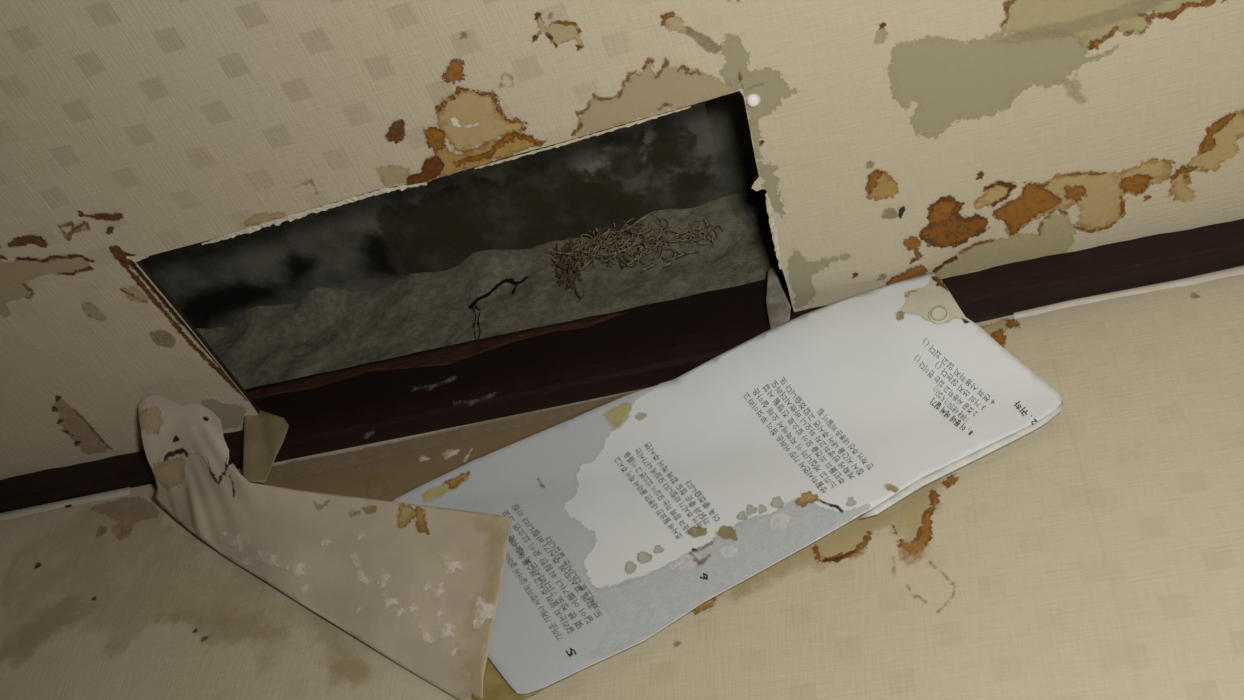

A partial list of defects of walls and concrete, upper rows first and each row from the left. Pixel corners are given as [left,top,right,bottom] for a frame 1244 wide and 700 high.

damp [364,11,797,276]
crack [468,276,528,339]
peeling [255,388,647,501]
peeling [94,497,158,540]
damp [735,480,937,594]